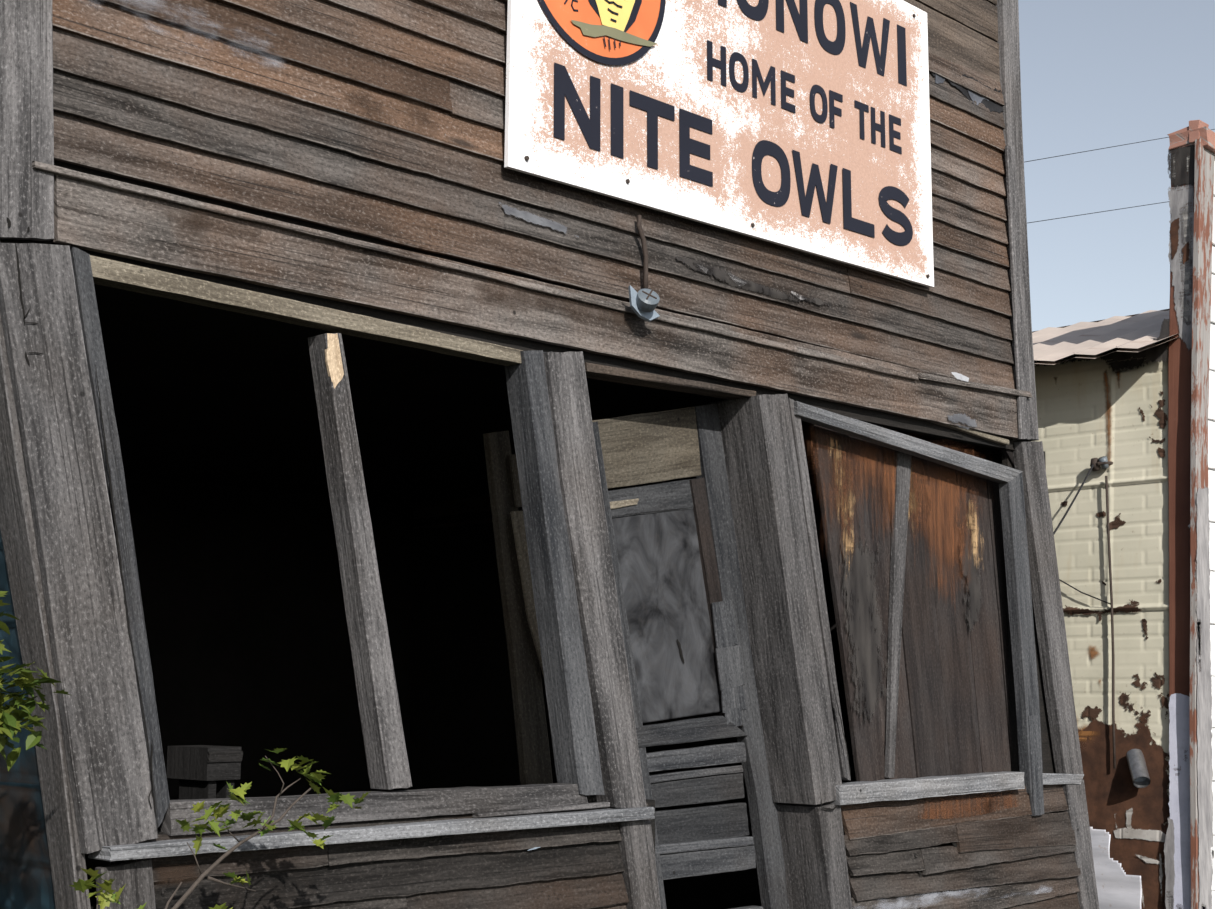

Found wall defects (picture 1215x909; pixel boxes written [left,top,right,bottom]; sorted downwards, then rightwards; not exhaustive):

peeling [1167,145,1195,350]
peeling [1114,486,1214,909]